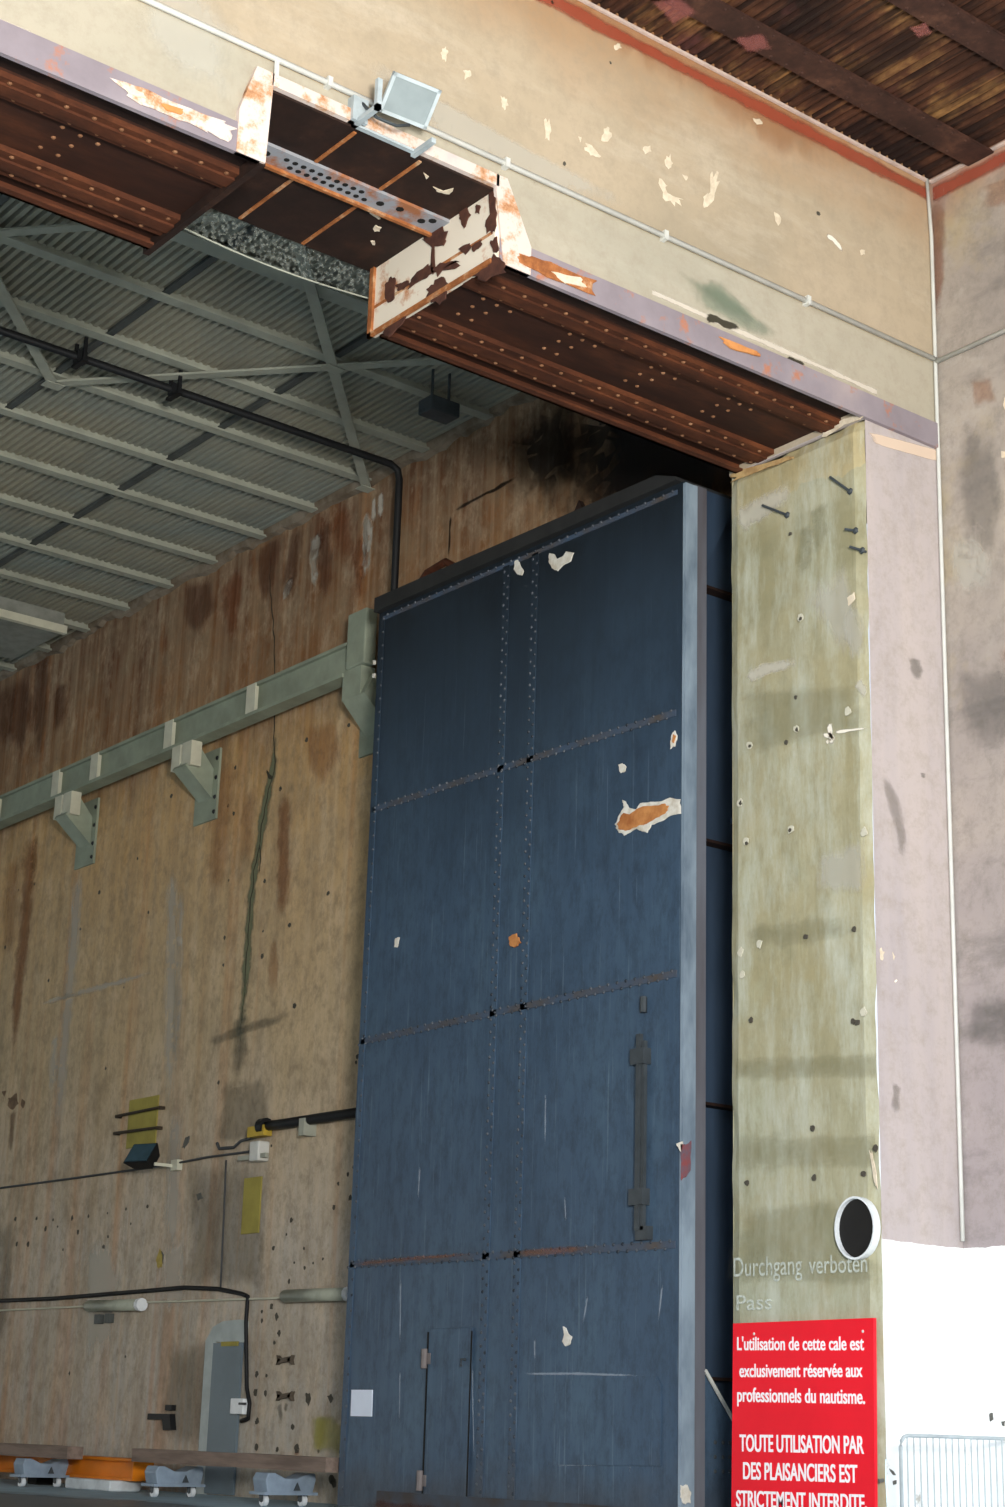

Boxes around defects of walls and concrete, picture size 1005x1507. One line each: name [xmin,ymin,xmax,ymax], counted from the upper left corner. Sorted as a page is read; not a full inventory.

peeling [578,127,612,157]
peeling [643,146,688,206]
peeling [703,171,720,208]
peeling [385,190,597,305]
peeling [719,337,761,357]
leakage [363,494,382,568]
leakage [311,536,319,580]
peeling [514,560,524,575]
peeling [548,551,574,571]
crack [268,584,276,674]
peeling [615,798,681,836]
crack [239,715,277,1030]